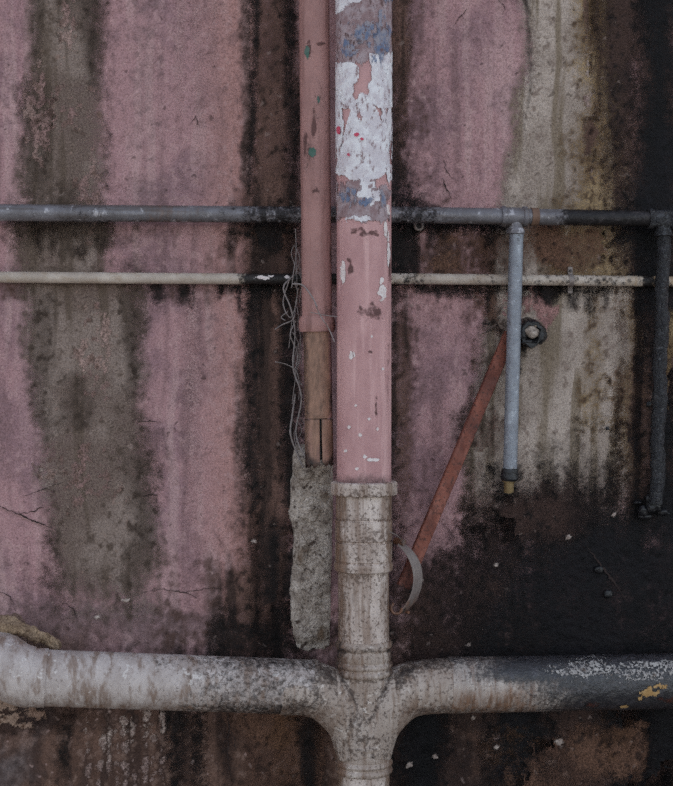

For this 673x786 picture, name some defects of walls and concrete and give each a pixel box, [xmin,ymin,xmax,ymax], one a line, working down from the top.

damp [15,0,109,205]
damp [233,0,301,206]
damp [13,221,116,272]
damp [229,223,301,274]
damp [522,285,654,518]
crack [0,482,63,530]
damp [15,283,167,620]
damp [175,284,313,659]
spalling [0,613,62,650]
flaking render [0,700,46,728]
damp [390,714,449,786]
damp [481,712,557,786]